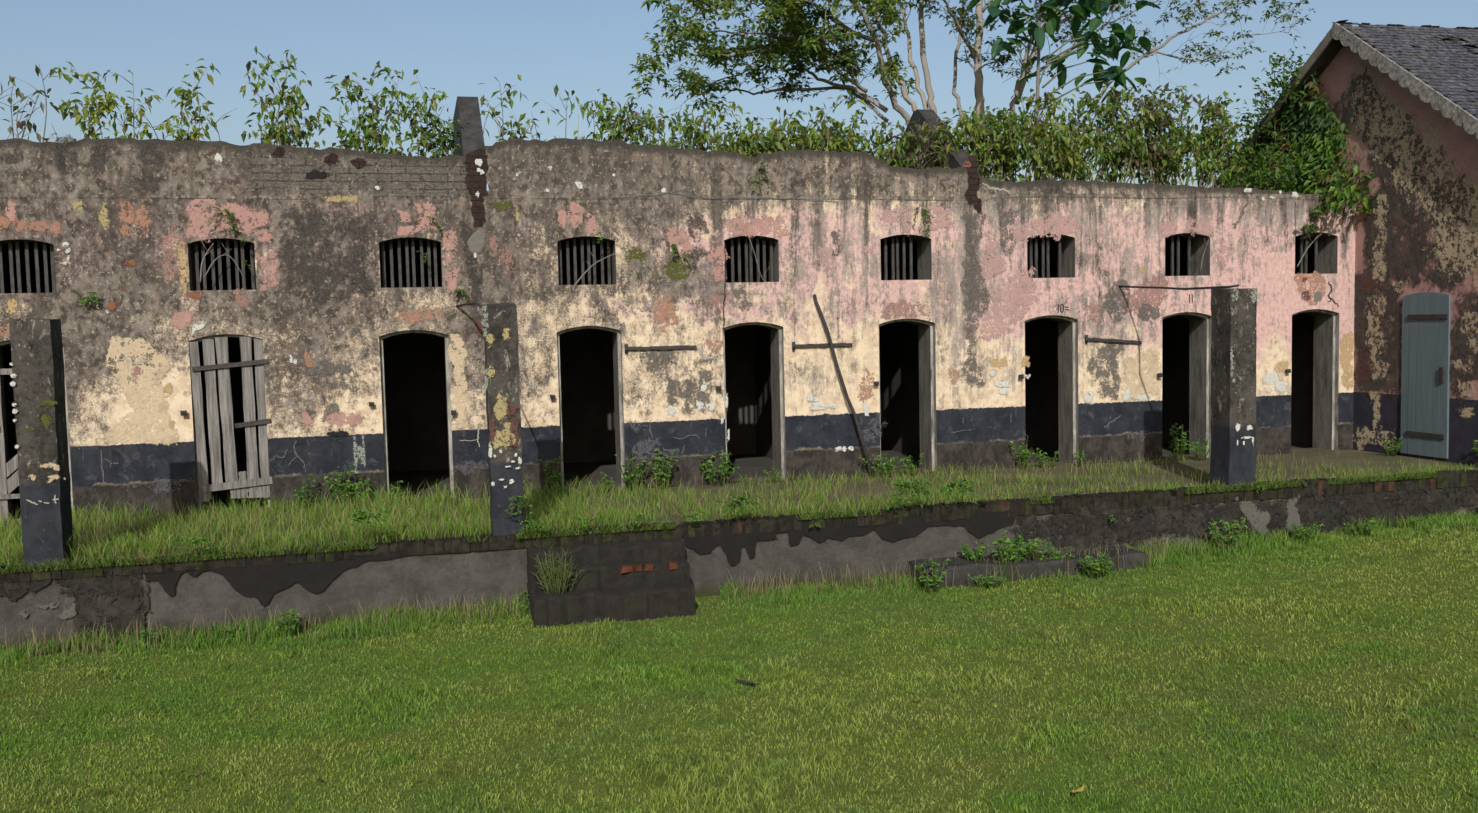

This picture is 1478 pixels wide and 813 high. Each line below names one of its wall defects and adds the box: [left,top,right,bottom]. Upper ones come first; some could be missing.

spalling [118,146,514,330]
water stain [831,230,841,256]
water stain [960,208,1031,395]
water stain [1293,68,1478,405]
peeling [1339,62,1478,450]
peeling [101,336,179,446]
peeling [300,410,365,437]
peeling [448,334,470,428]
peeling [1123,350,1162,401]
peeling [28,462,66,483]
water stain [145,552,407,606]